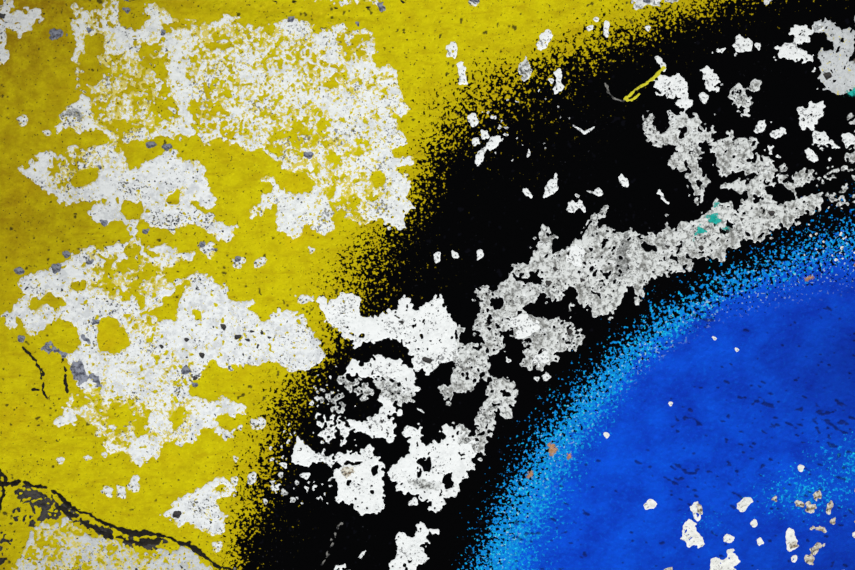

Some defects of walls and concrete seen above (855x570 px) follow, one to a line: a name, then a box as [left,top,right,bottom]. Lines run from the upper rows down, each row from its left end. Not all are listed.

peeling [446,42,468,85]
peeling [712,34,761,56]
peeling [773,17,855,95]
peeling [0,0,416,499]
peeling [269,56,855,516]
crack [22,346,69,399]
peeling [0,485,213,570]
crack [0,469,236,570]
peeling [389,521,439,570]
peeling [680,501,705,548]
peeling [710,534,740,570]
peeling [785,490,836,565]